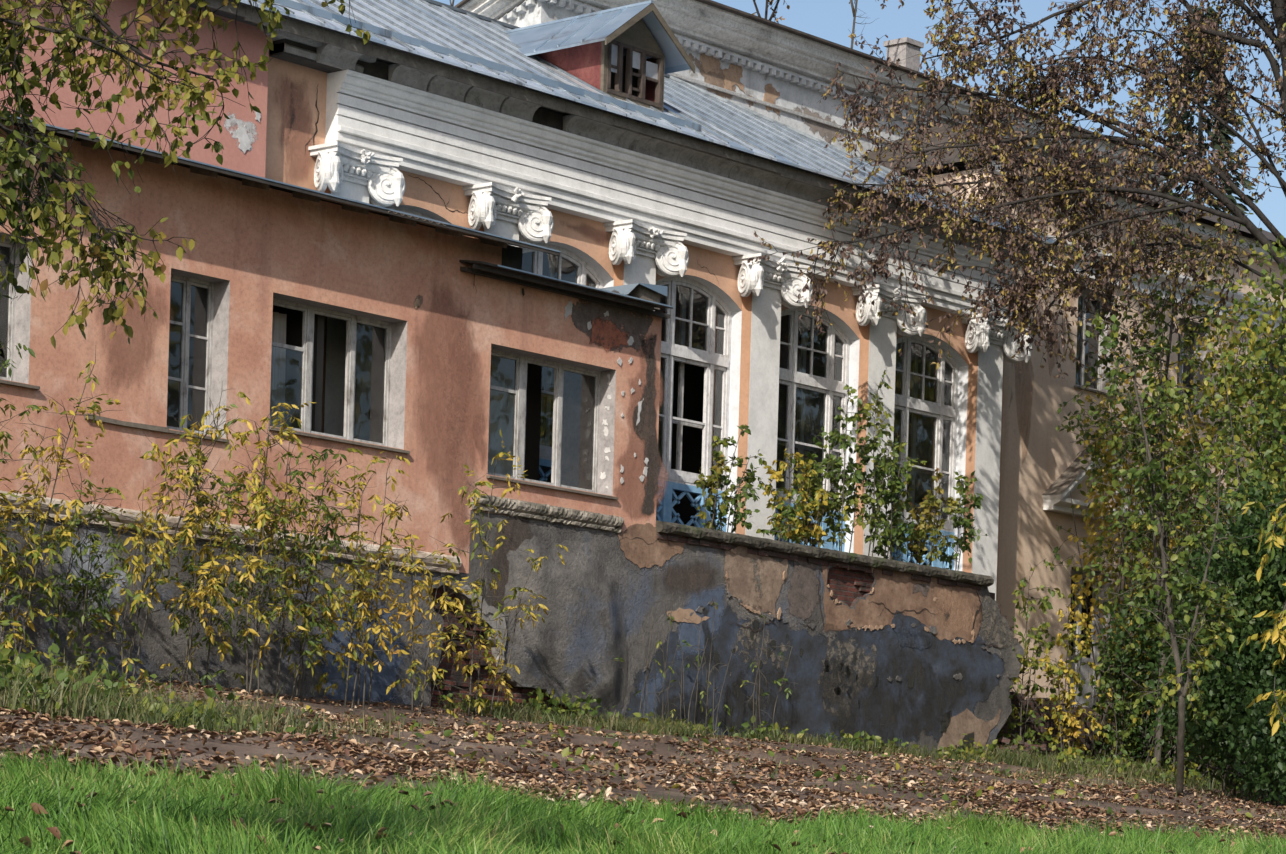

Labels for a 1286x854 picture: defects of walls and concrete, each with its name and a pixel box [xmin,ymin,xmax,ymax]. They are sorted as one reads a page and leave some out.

peeling [224,111,261,154]
crack [305,86,319,158]
peeling [688,53,844,146]
peeling [564,290,653,489]
damp [616,335,667,517]
peeling [617,523,685,568]
peeling [667,546,803,676]
peeling [818,563,1018,718]
peeling [937,708,1001,755]